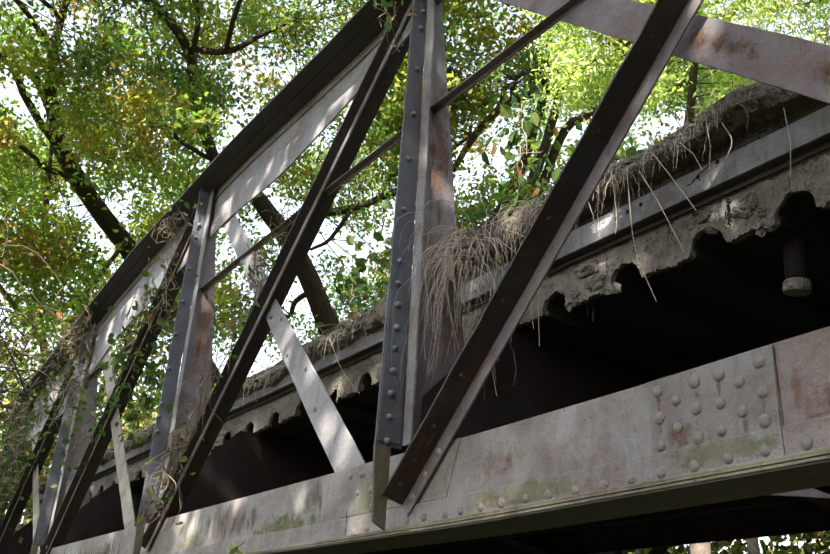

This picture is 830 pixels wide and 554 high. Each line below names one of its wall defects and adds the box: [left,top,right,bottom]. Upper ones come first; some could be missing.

rust [691,32,757,58]
peeling [589,210,623,234]
spalling [564,273,621,312]